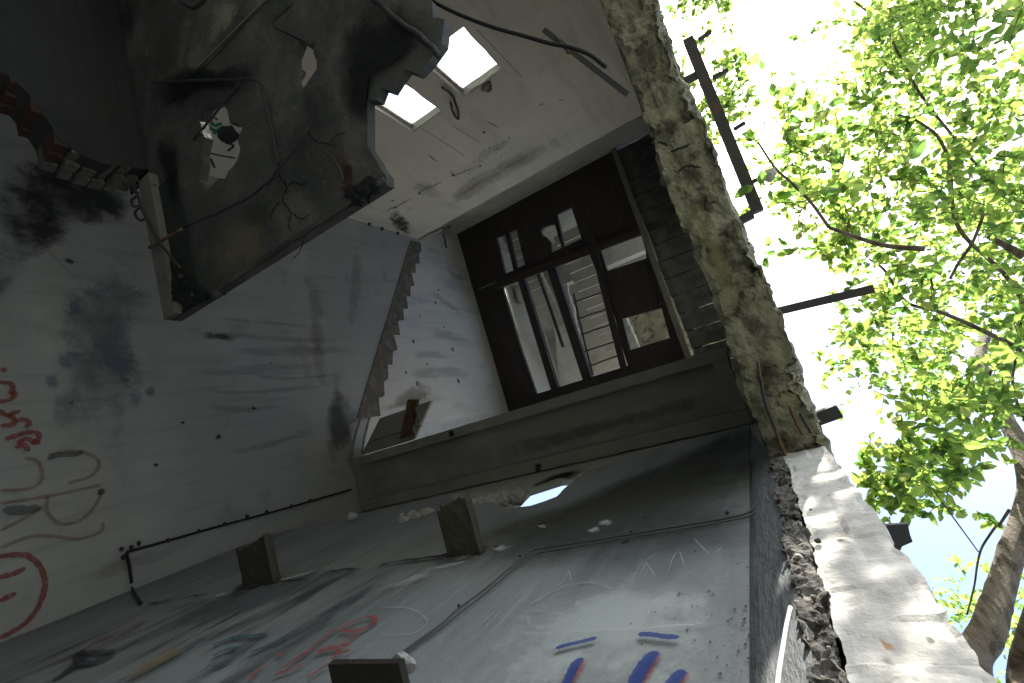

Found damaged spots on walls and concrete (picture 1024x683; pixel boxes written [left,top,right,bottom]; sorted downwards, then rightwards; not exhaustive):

crack [258,172,309,258]
spalling [769,453,849,683]